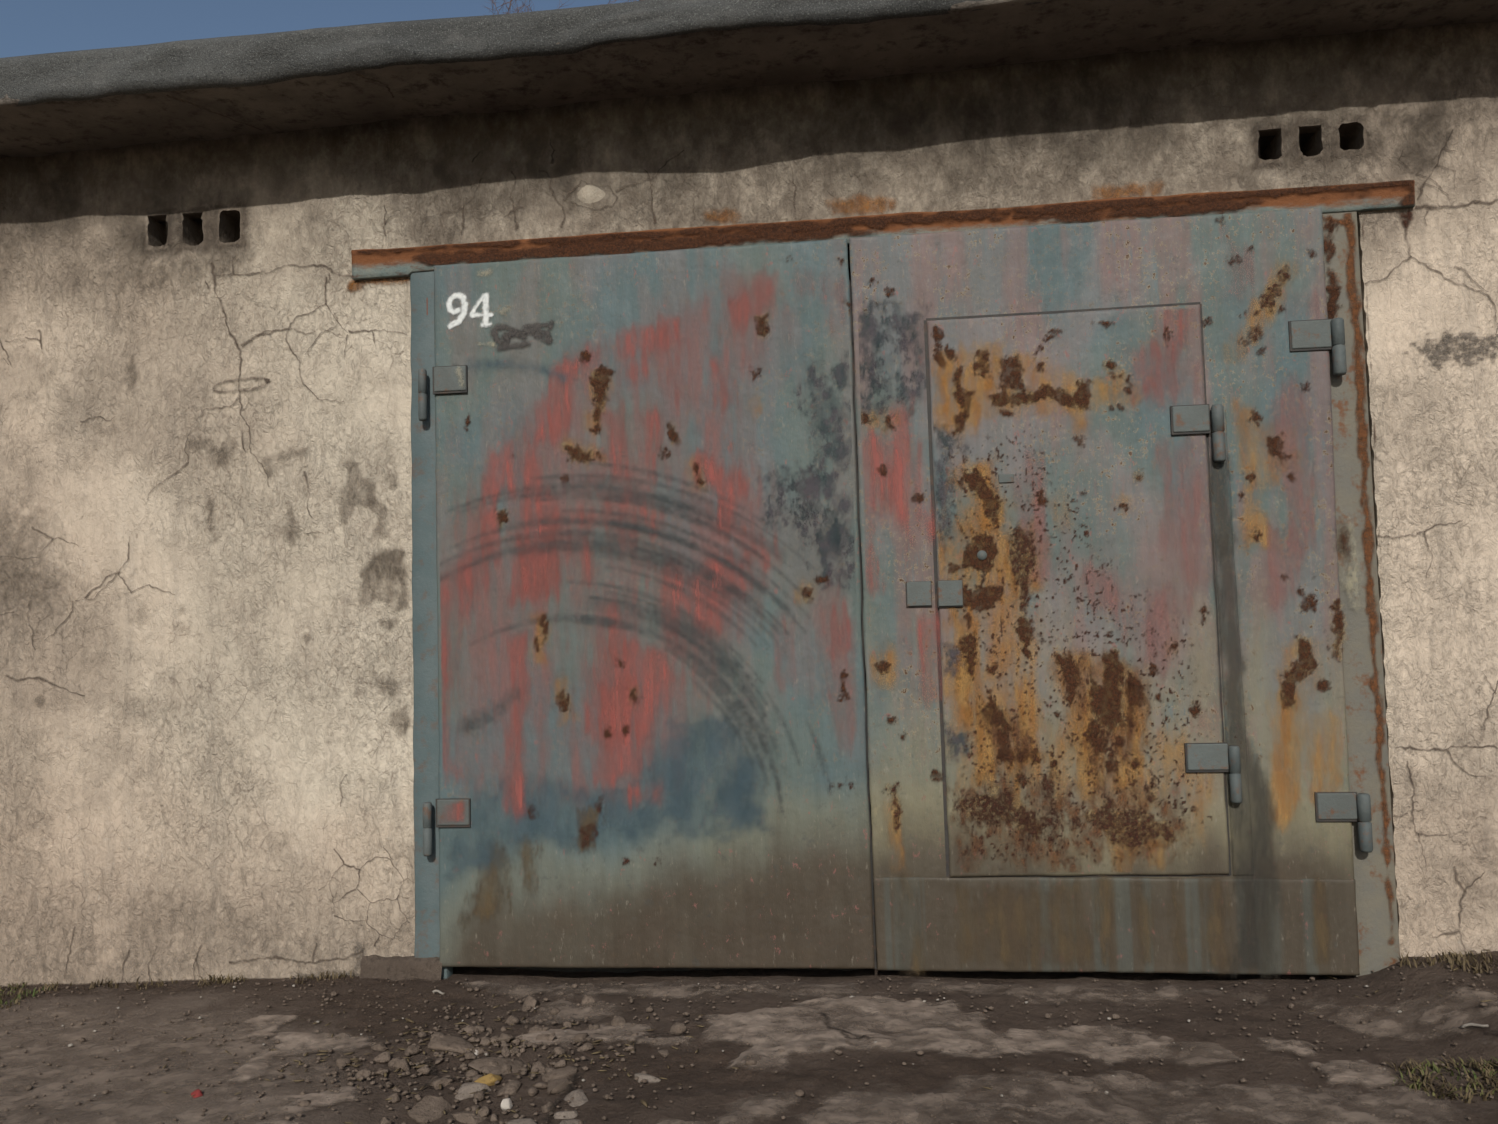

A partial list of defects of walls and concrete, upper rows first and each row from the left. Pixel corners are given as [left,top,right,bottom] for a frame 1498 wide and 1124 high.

rust [358,180,1415,265]
crack [1368,130,1498,335]
crack [148,254,407,495]
rust [580,351,613,434]
rust [933,326,1132,445]
rust [1239,412,1295,498]
flaking render [1411,333,1498,368]
crack [1,543,175,696]
rust [941,431,1212,871]
rust [1280,575,1346,730]
rust [1309,213,1394,918]
crack [1377,521,1459,577]